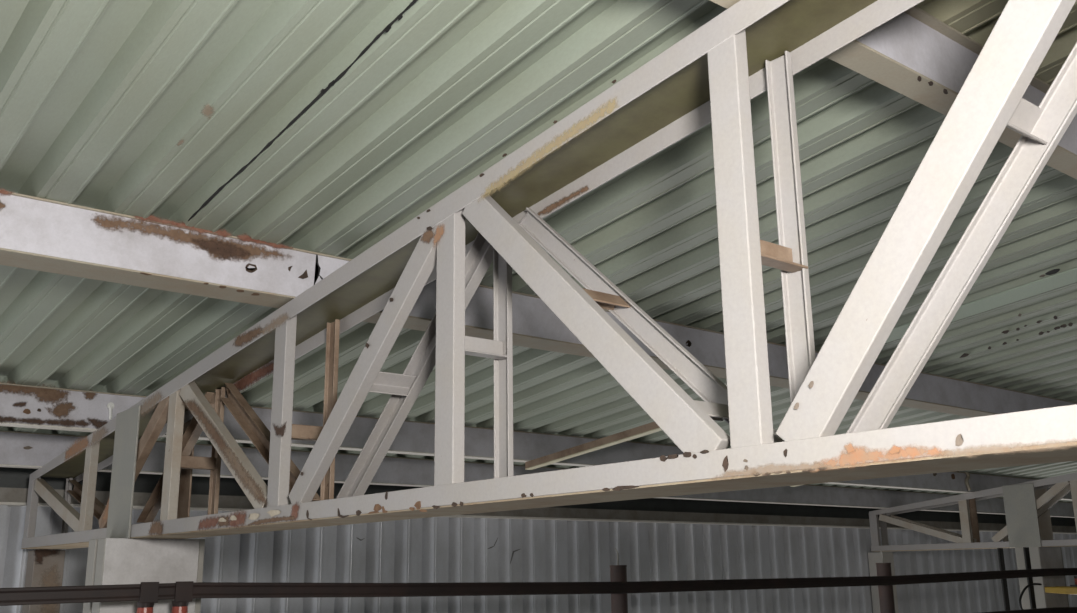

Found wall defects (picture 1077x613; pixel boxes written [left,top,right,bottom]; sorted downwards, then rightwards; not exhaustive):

rust [94,215,293,260]
rust [233,315,288,346]
rust [185,401,268,505]
peeling [660,450,709,462]
peeling [198,503,312,530]
peeling [338,491,388,518]
peeling [409,501,463,512]